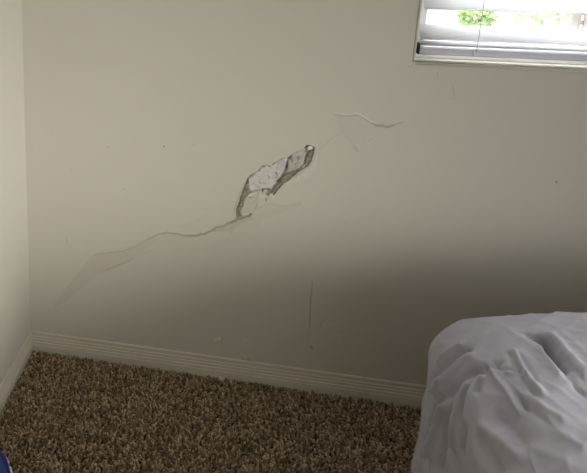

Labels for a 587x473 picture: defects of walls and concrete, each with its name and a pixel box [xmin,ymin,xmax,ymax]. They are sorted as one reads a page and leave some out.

flaking render [236,145,318,216]
crack [93,215,251,272]